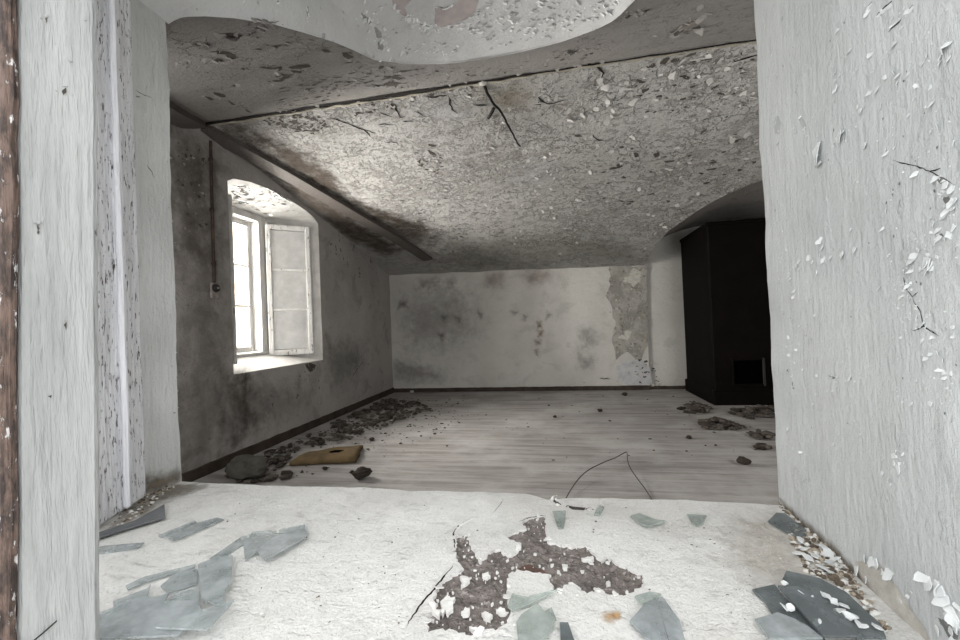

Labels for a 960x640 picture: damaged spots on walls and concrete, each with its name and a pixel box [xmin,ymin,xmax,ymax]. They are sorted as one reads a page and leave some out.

damp [240,131,433,255]
peeling [169,0,651,134]
crack [206,39,757,143]
peeling [774,109,856,176]
peeling [854,20,954,167]
crack [894,160,952,184]
peeling [605,265,662,387]
crack [903,277,938,336]
spalling [424,514,643,636]